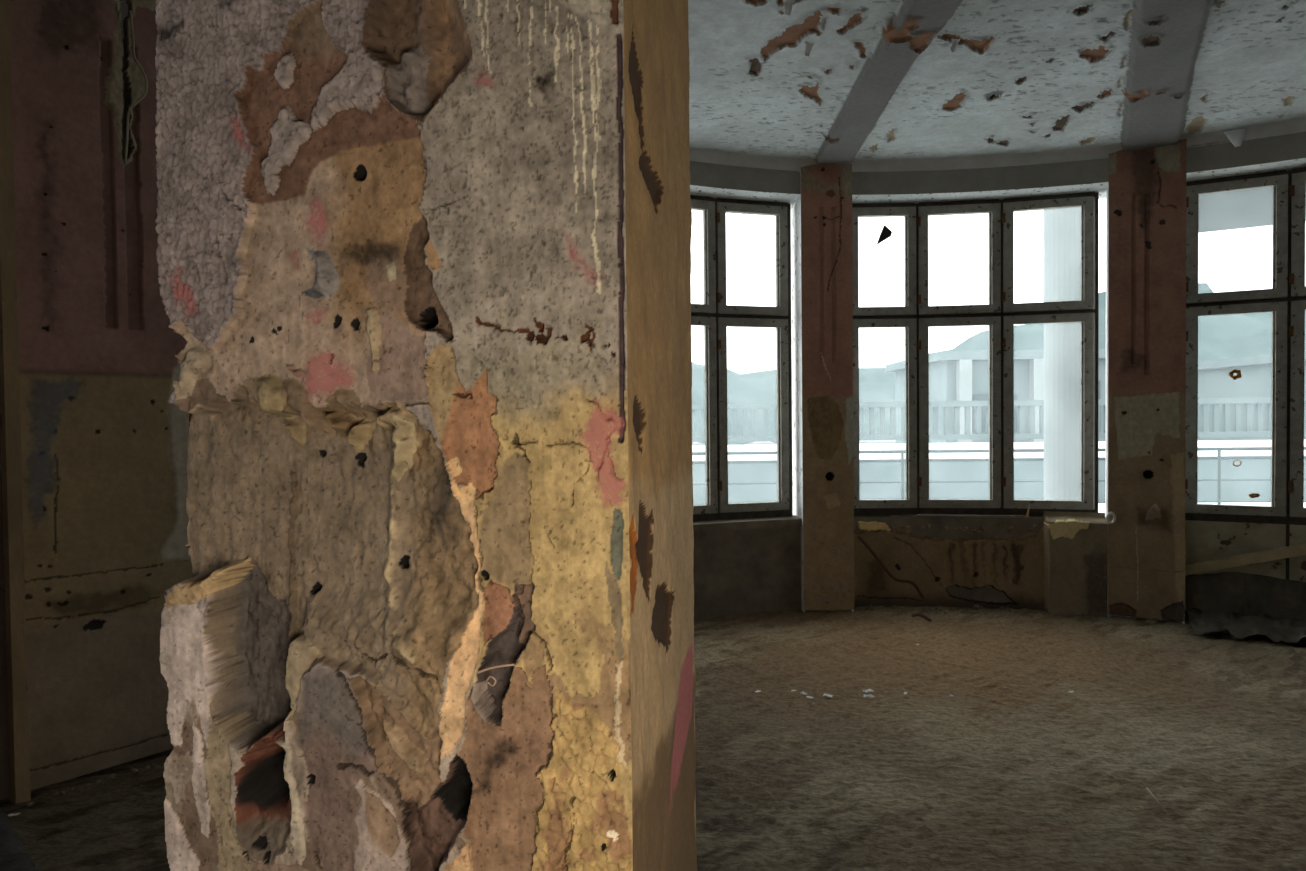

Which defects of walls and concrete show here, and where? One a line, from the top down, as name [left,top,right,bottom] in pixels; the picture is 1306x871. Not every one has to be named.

peeling [1073,0,1106,17]
peeling [881,19,996,55]
peeling [1023,9,1183,139]
peeling [942,92,968,112]
peeling [869,128,898,153]
peeling [985,138,1011,147]
peeling [1224,129,1246,147]
spalling [151,0,633,871]
crack [453,393,622,871]